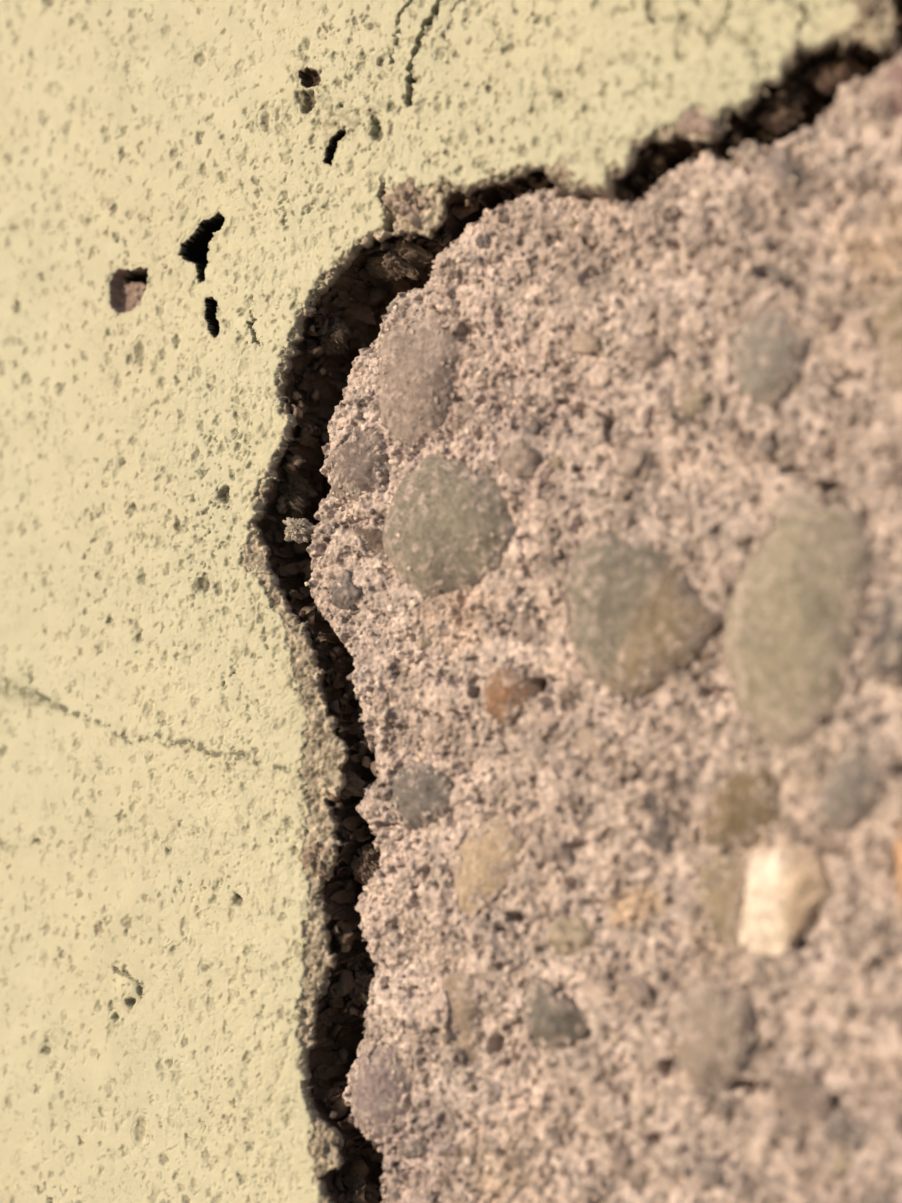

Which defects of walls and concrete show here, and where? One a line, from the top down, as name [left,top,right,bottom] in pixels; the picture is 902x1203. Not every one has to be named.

peeling [214,480,236,509]
spalling [240,0,902,1203]
crack [247,0,902,1203]
peeling [230,890,247,912]
peeling [198,961,214,977]